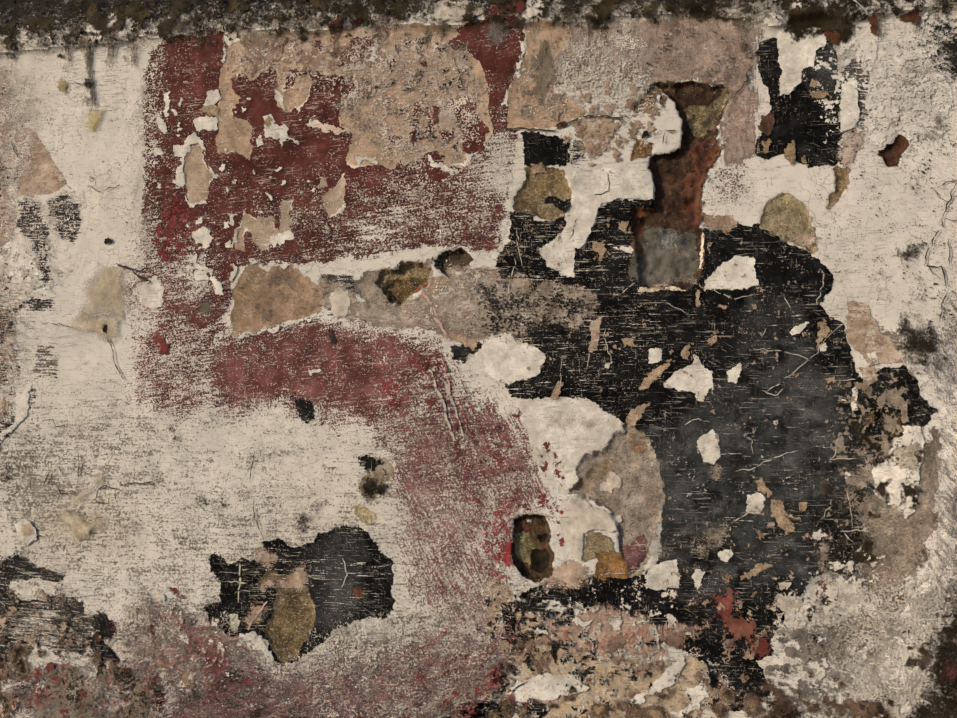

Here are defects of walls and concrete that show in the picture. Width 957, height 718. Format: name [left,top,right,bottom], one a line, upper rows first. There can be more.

leakage [644,4,658,23]
peeling [918,294,957,419]